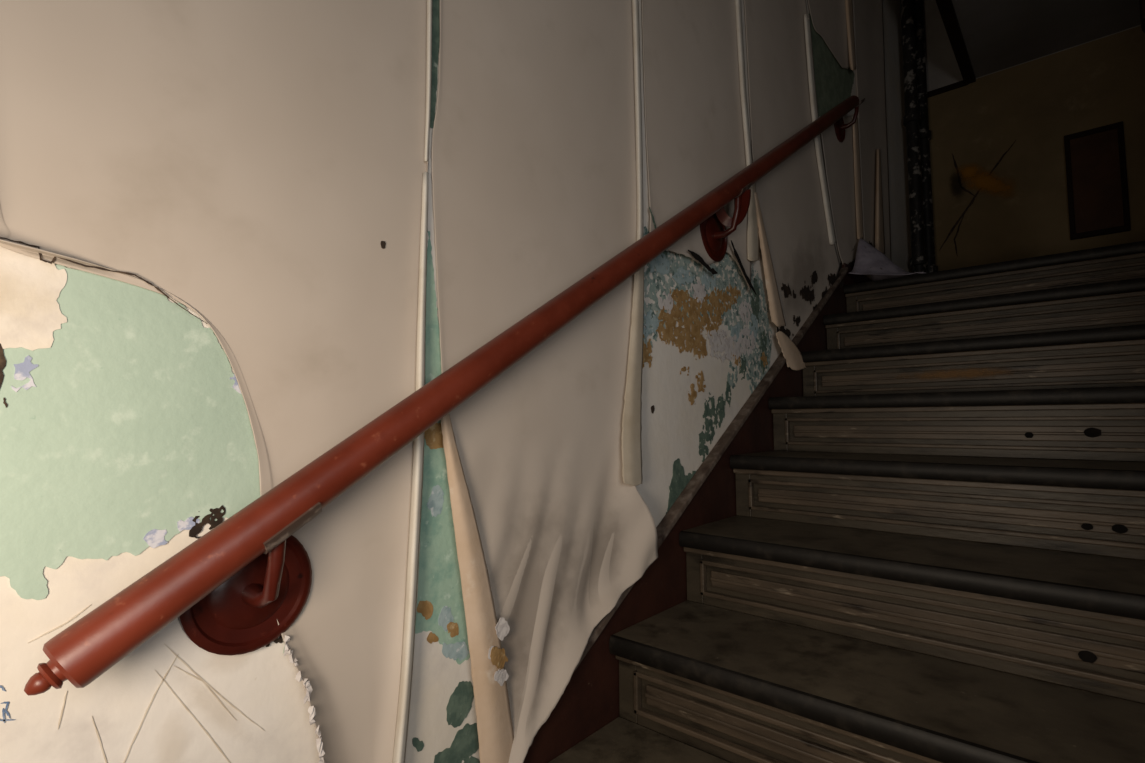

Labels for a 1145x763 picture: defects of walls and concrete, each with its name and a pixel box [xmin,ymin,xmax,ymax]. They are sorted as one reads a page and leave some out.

peeling [430,0,440,128]
peeling [809,14,855,116]
peeling [425,231,442,385]
peeling [0,246,260,600]
peeling [642,250,772,515]
peeling [415,420,470,665]
spalling [283,635,326,763]
peeling [412,681,480,763]
peeling [488,617,510,686]